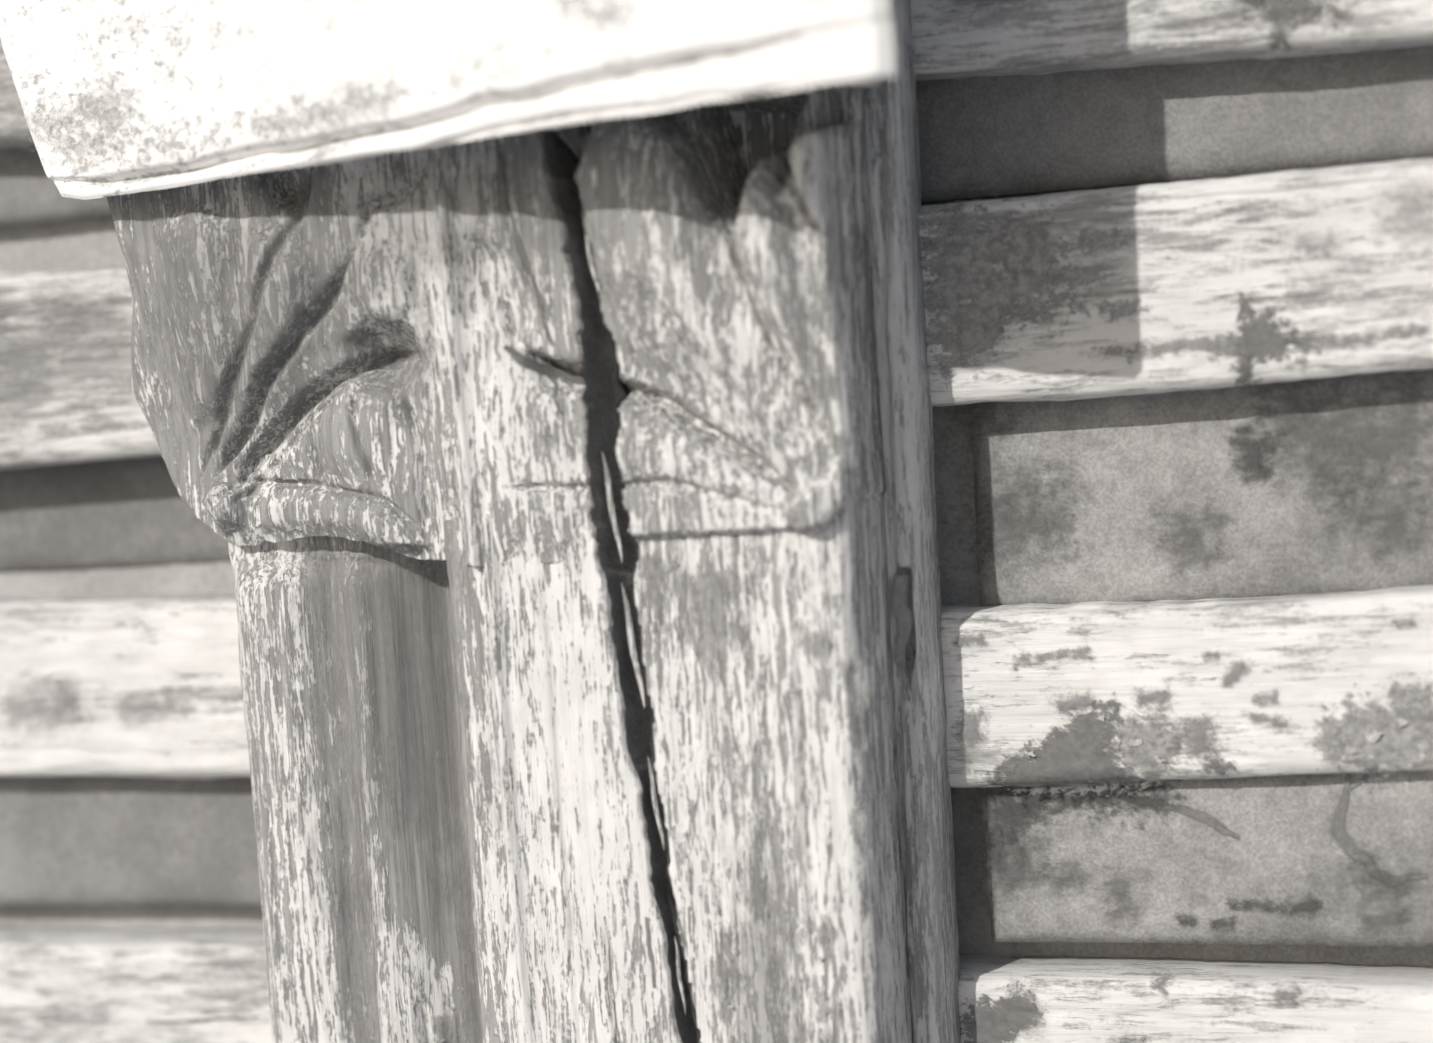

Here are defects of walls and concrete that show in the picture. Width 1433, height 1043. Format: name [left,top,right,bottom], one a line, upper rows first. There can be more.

crack [496,127,701,1043]
peeling [635,547,749,688]
peeling [795,619,869,762]
damp [1013,647,1092,670]
damp [1134,687,1171,708]
damp [1222,661,1247,686]
damp [1250,689,1287,727]
damp [977,782,1182,883]
peeling [426,1007,457,1043]
peeling [714,929,745,1043]
peeling [803,916,842,1043]
damp [959,982,1042,1043]